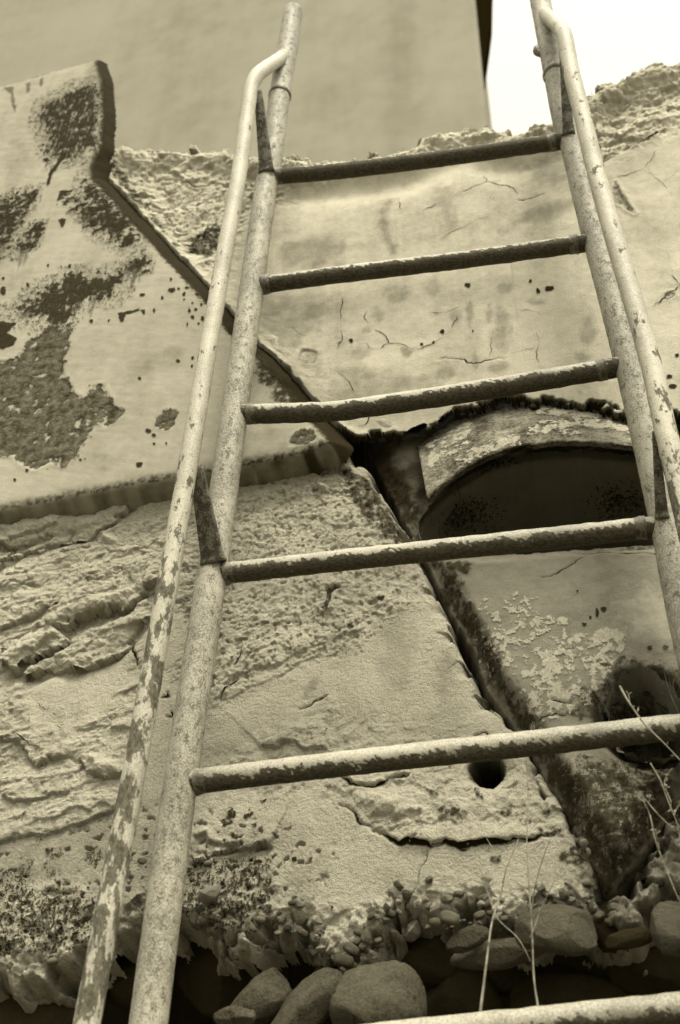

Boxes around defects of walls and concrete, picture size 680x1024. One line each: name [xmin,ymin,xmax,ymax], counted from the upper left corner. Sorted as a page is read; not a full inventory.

crack [338,296,560,364]
peeling [0,505,131,571]
peeling [0,556,161,682]
peeling [473,591,630,730]
crack [340,773,546,911]